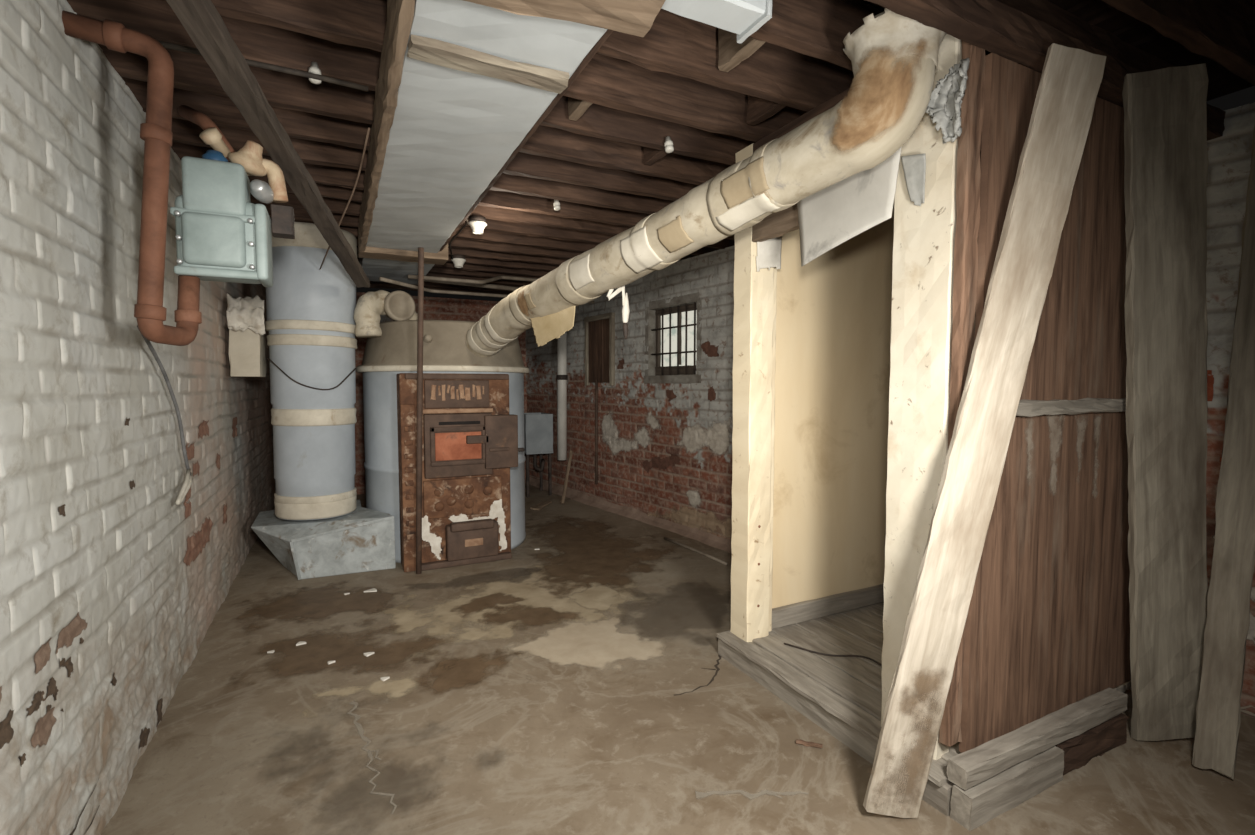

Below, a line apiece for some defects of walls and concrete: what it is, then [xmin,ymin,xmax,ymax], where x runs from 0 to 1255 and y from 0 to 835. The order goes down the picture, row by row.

spalling [701,341,719,357]
spalling [643,453,681,473]
water stain [648,506,732,538]
water stain [236,517,672,698]
peeling [0,612,88,767]
spalling [139,698,163,748]